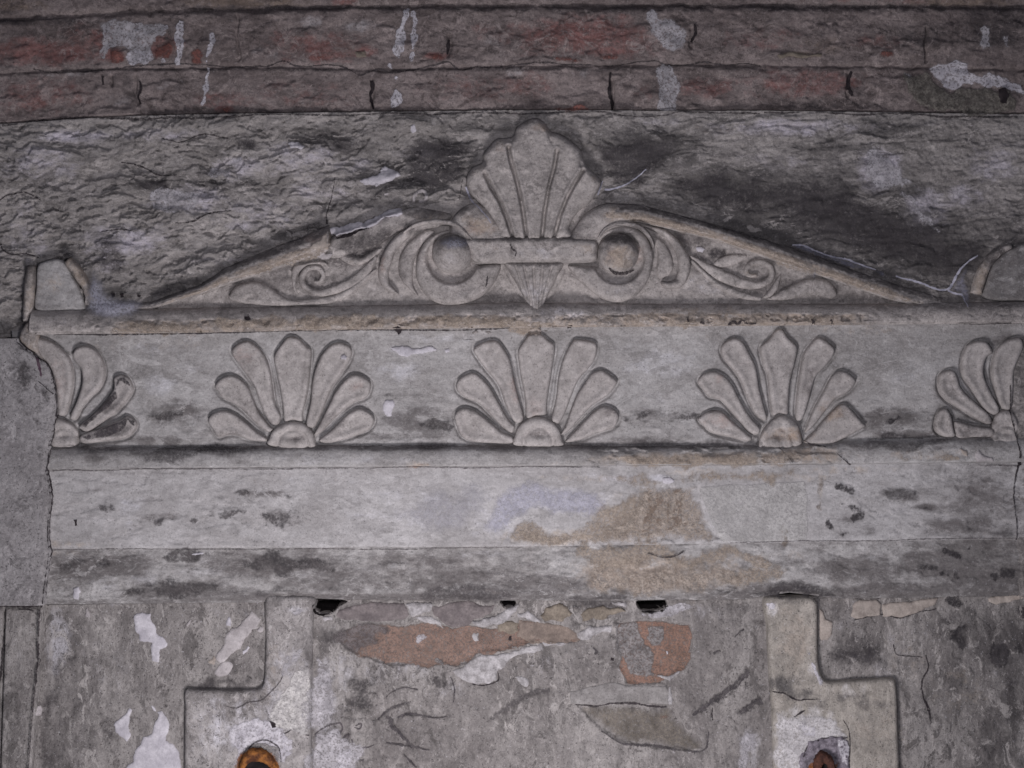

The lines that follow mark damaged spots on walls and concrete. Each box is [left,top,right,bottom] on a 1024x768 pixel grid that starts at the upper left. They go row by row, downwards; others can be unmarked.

spalling [904,60,1024,116]
flaking render [258,208,403,274]
crack [0,328,600,768]
peeling [133,612,168,662]
peeling [208,611,264,677]
flaking render [333,600,580,703]
peeling [851,598,938,621]
peeling [988,595,1024,605]
spalling [490,676,550,720]
peeling [114,706,181,768]